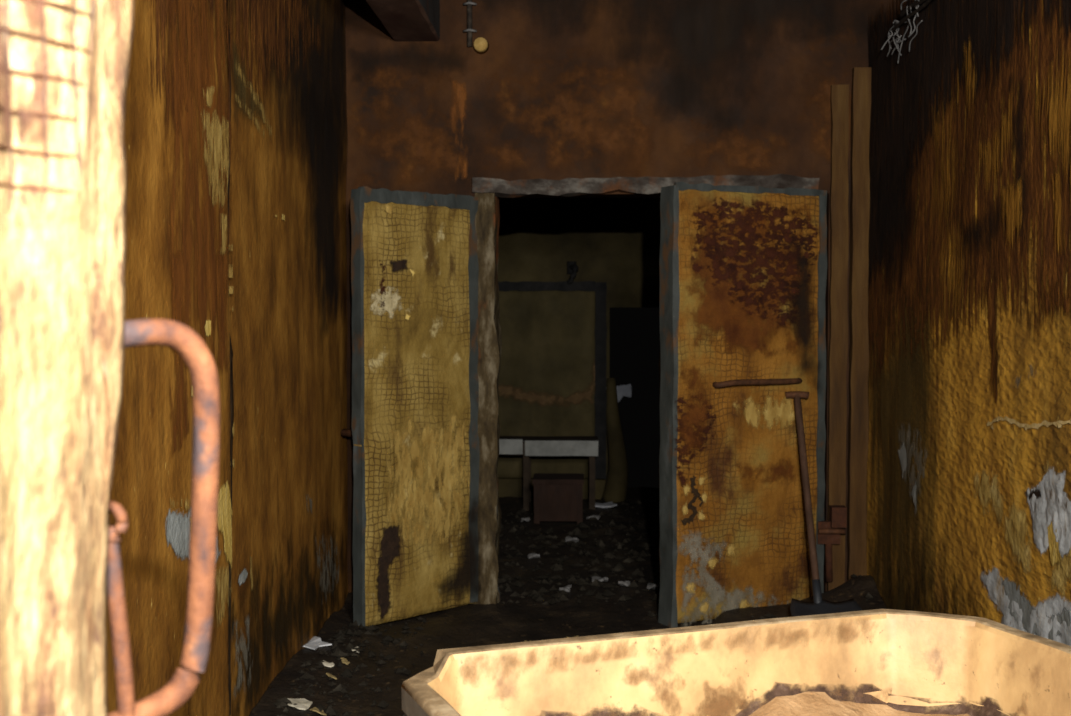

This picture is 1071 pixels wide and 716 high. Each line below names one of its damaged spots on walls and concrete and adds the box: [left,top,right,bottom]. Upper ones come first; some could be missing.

peeling [1036,52,1071,254]
peeling [370,259,415,320]
rust [692,197,818,325]
water stain [377,525,400,620]
flaking render [974,461,1071,646]